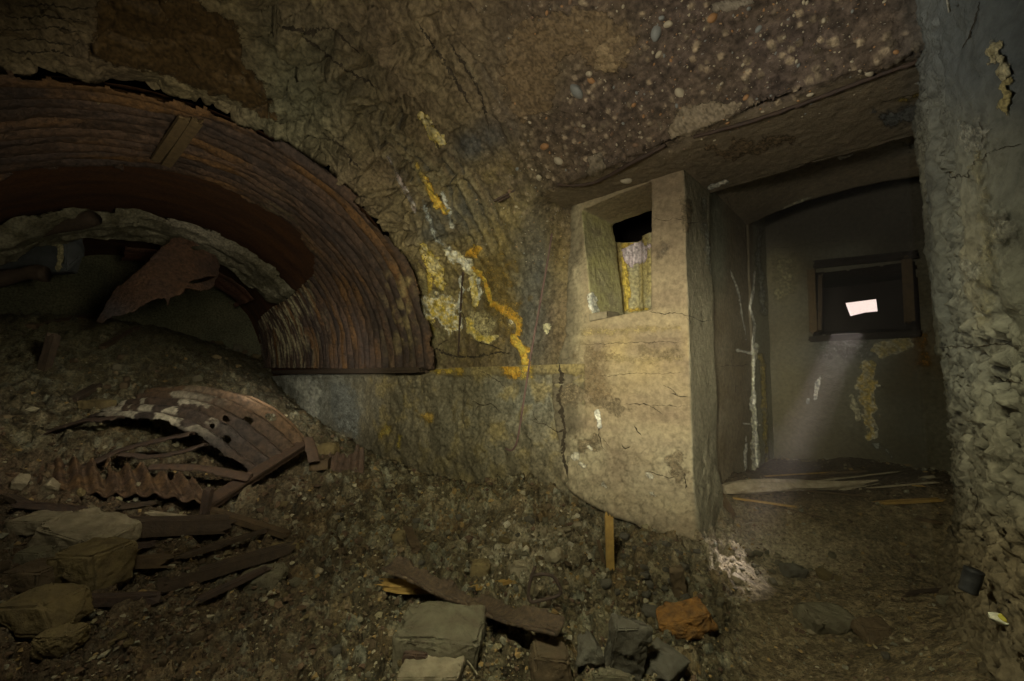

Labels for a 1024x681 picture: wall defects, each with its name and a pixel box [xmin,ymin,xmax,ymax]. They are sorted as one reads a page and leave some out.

water stain [417,111,446,148]
water stain [985,40,1013,116]
water stain [387,156,531,378]
rust [81,431,253,482]
crack [528,358,686,477]
water stain [730,230,797,471]
water stain [817,337,915,458]